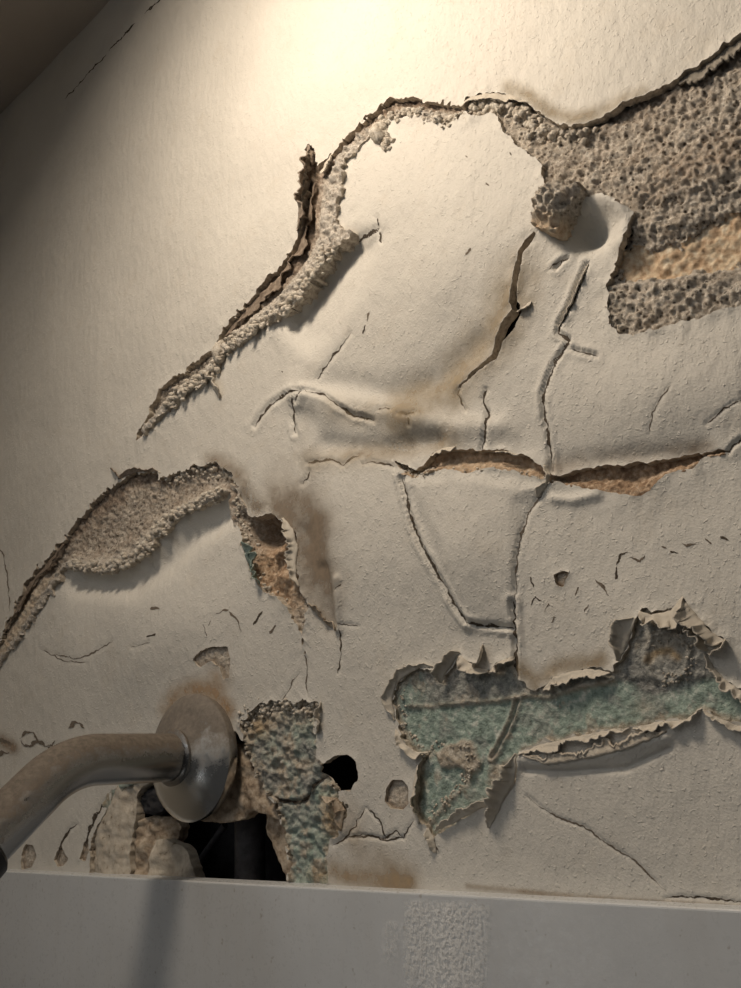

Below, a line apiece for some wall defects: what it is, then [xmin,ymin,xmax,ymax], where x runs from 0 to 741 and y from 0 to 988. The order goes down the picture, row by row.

crack [66,0,160,98]
crack [359,218,382,243]
spalling [141,40,741,437]
crack [256,313,414,433]
spalling [0,464,336,667]
water stain [210,458,333,598]
crack [303,258,741,676]
peeling [195,647,230,678]
spalling [82,698,358,884]
crack [334,808,413,845]
peeling [380,596,741,853]
crack [527,796,741,902]